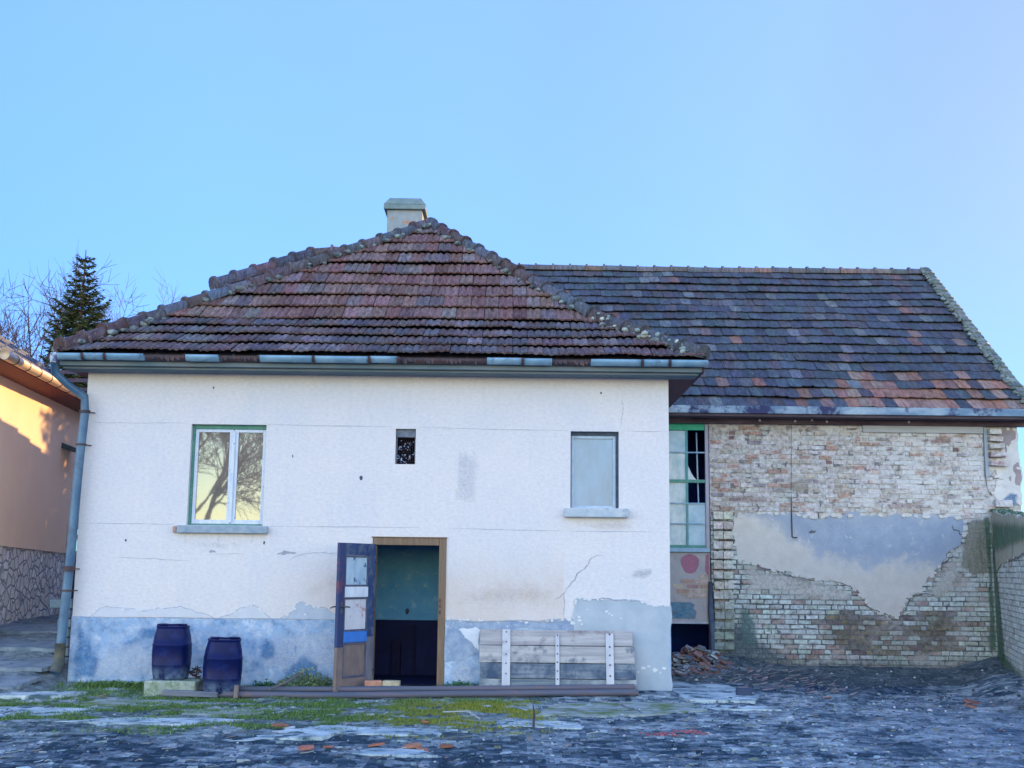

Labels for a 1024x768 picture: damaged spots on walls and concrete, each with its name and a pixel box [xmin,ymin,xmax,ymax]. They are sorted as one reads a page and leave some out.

peeling [991,427,1024,575]
peeling [89,601,335,619]
crack [454,531,646,623]
peeling [444,597,673,691]
peeling [732,500,969,619]